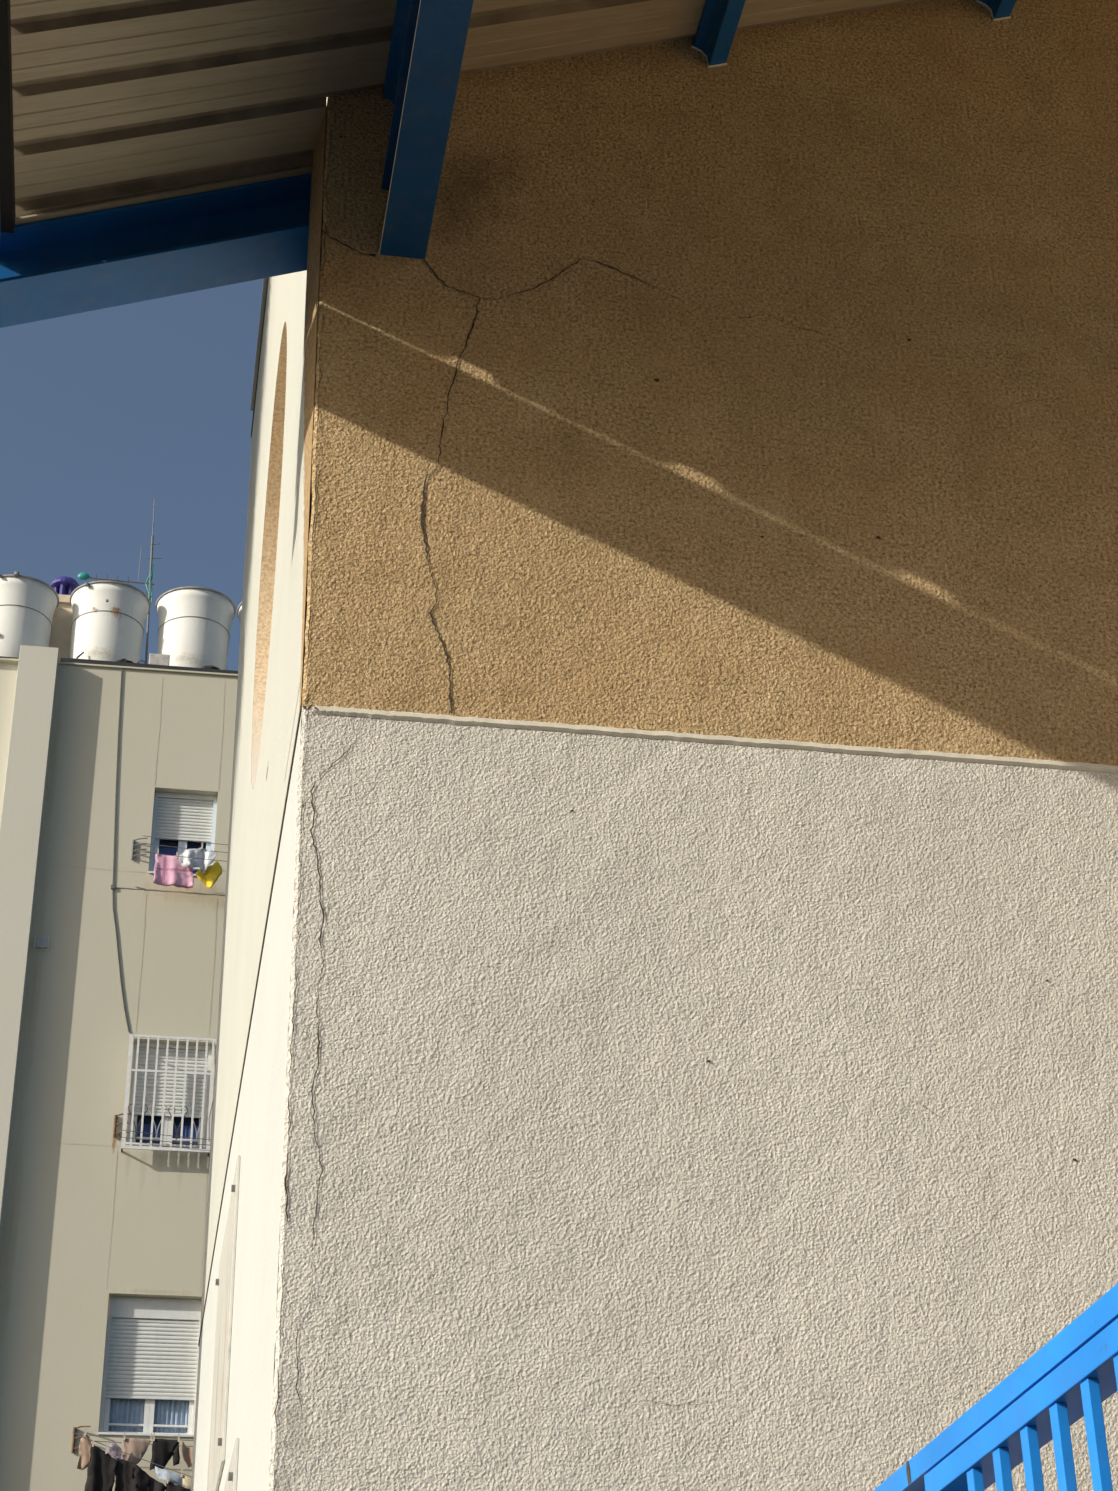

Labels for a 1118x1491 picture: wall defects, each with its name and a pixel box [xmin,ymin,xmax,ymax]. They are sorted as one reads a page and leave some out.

crack [274,132,370,1491]
crack [421,258,682,714]